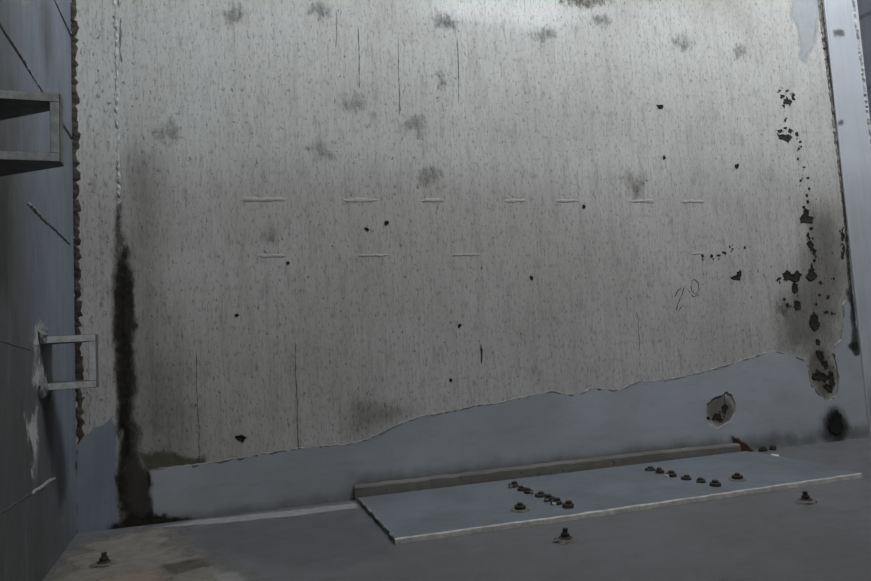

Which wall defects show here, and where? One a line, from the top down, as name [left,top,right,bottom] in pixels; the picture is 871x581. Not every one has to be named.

leakage [111,203,192,529]
peeling [142,87,869,526]